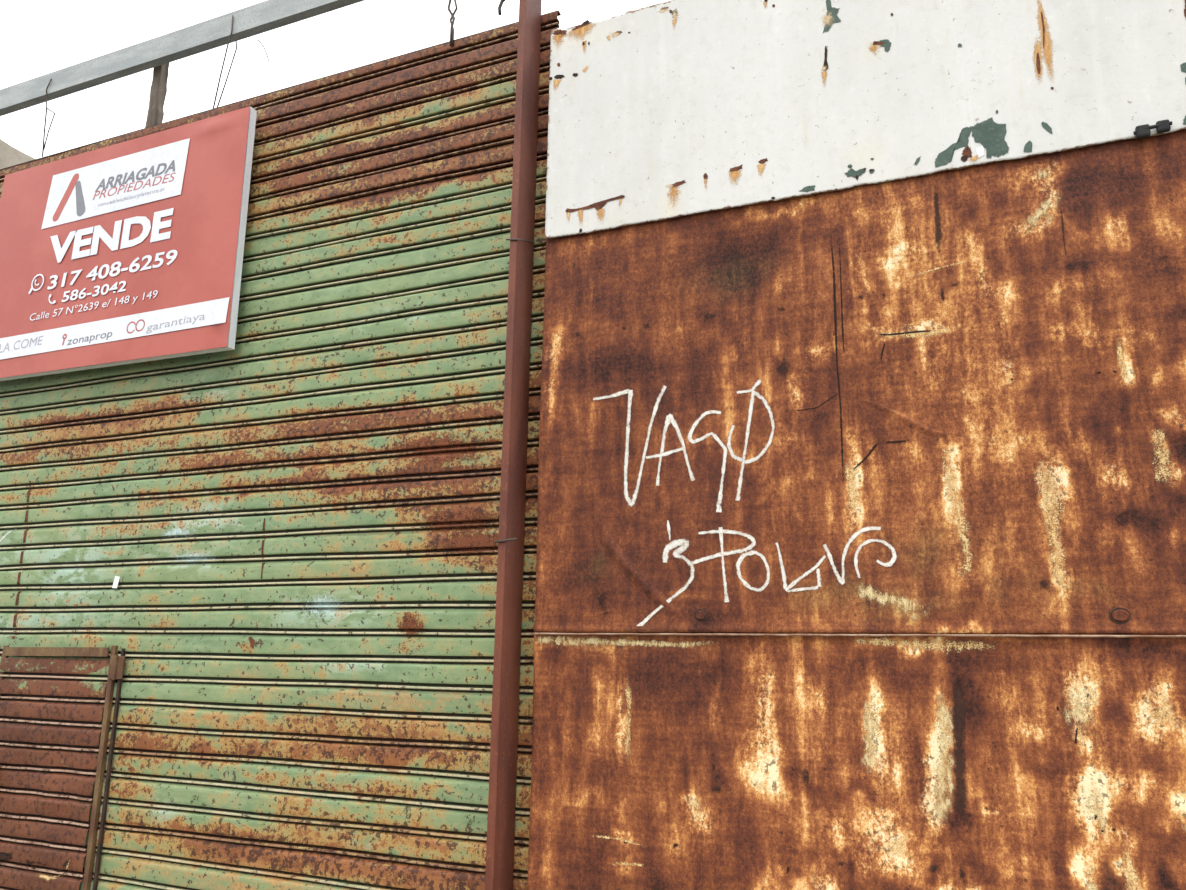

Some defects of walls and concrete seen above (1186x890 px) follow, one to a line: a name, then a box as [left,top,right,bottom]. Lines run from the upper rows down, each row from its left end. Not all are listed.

rust [552,20,593,51]
peeling [822,0,842,83]
rust [1034,1,1054,90]
peeling [935,110,1009,167]
rust [565,195,625,233]
rust [666,180,686,201]
rust [728,164,743,182]
rust [394,427,492,482]
rust [406,504,499,580]